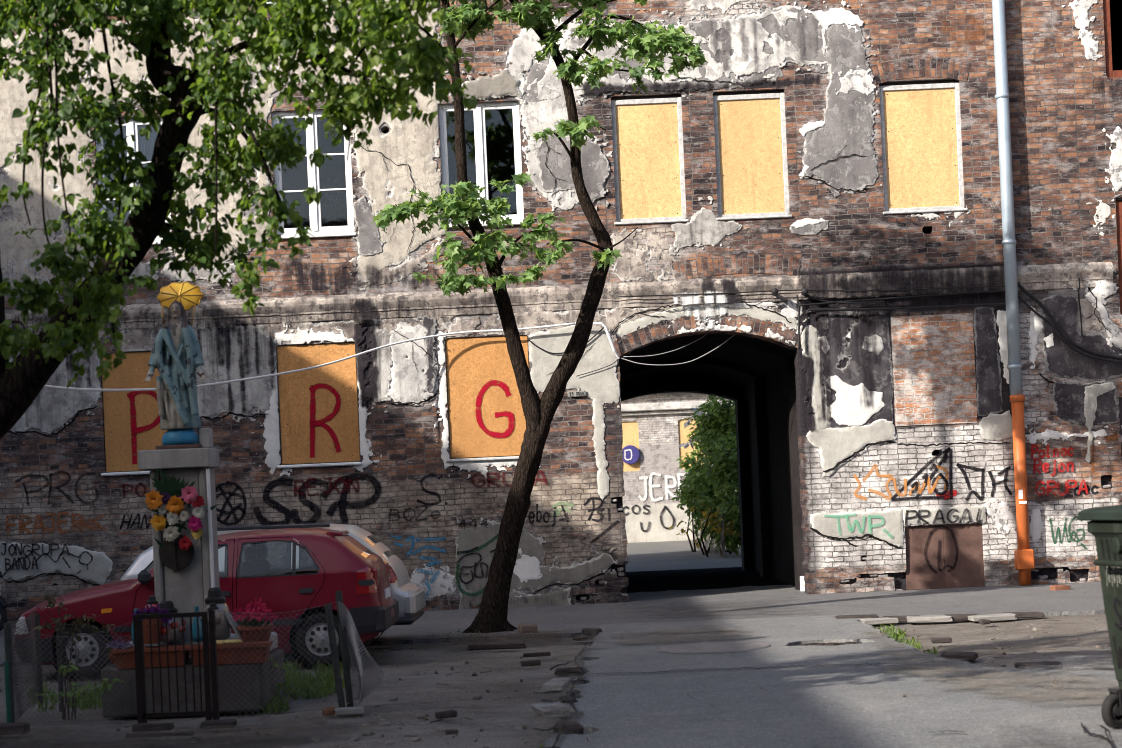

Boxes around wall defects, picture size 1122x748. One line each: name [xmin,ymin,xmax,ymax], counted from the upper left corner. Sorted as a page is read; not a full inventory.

flaking render [1061,0,1103,68]
flaking render [129,0,883,291]
crack [805,145,872,193]
flaking render [1086,126,1122,236]
flaking render [192,309,518,482]
flaking render [514,309,580,394]
flaking render [565,300,896,512]
damp [797,262,1004,432]
flaking render [410,516,500,609]
flaking render [508,518,628,607]